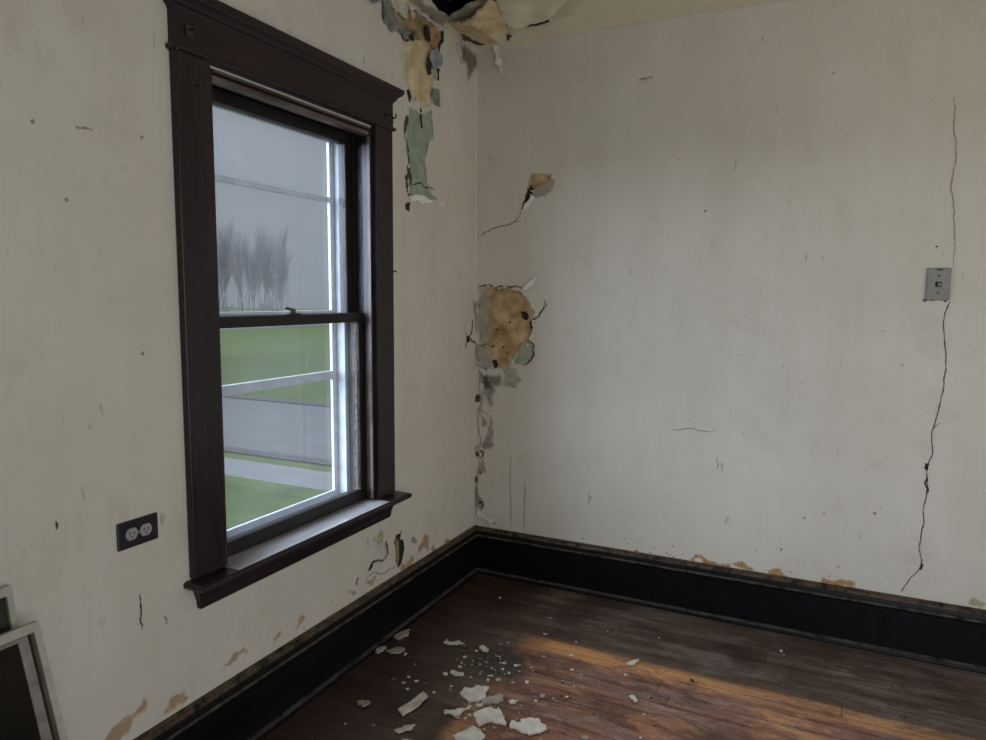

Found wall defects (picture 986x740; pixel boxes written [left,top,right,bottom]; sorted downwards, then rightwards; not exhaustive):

spalling [432,0,477,16]
peeling [496,0,567,30]
flaking render [372,0,446,212]
peeling [521,172,555,210]
crack [949,98,957,262]
flaking render [473,277,547,388]
crack [901,302,950,591]
peeling [365,529,417,581]